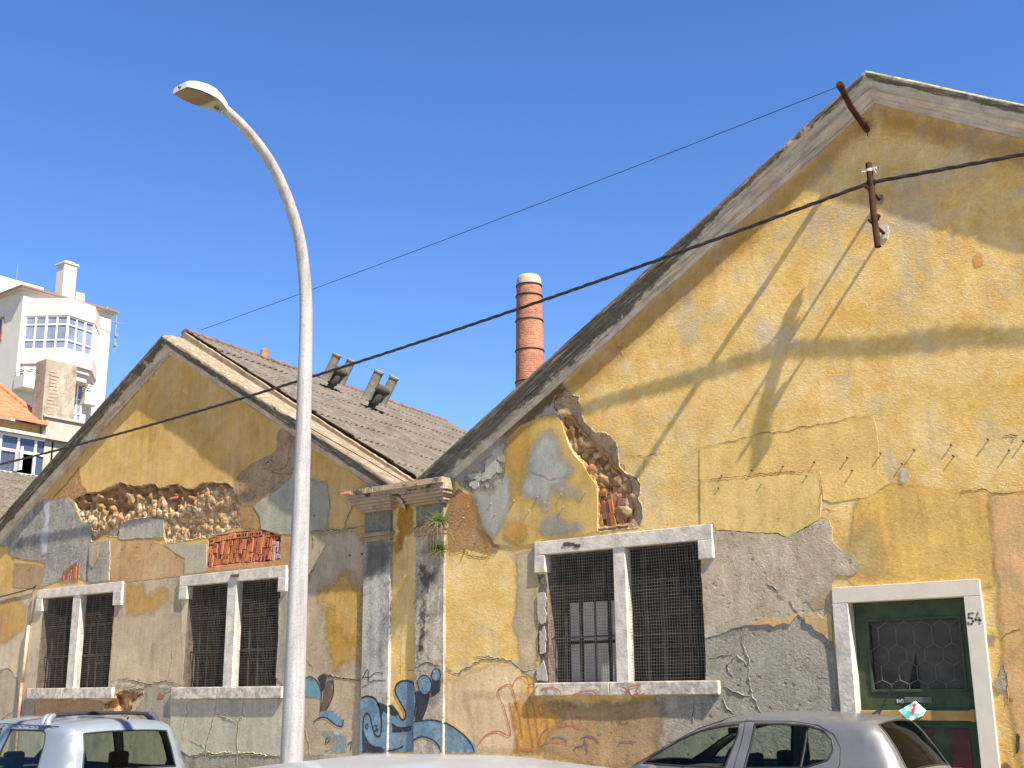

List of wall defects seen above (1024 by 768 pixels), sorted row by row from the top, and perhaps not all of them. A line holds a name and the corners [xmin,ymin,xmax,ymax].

flaking render [53,428,295,572]
peeling [464,443,507,492]
flaking render [551,392,644,533]
crack [698,469,830,537]
crack [699,416,867,448]
flaking render [58,562,80,581]
damp [318,504,413,671]
damp [414,565,435,652]
flaking render [752,588,833,641]
crack [307,655,536,687]
crack [709,627,761,715]